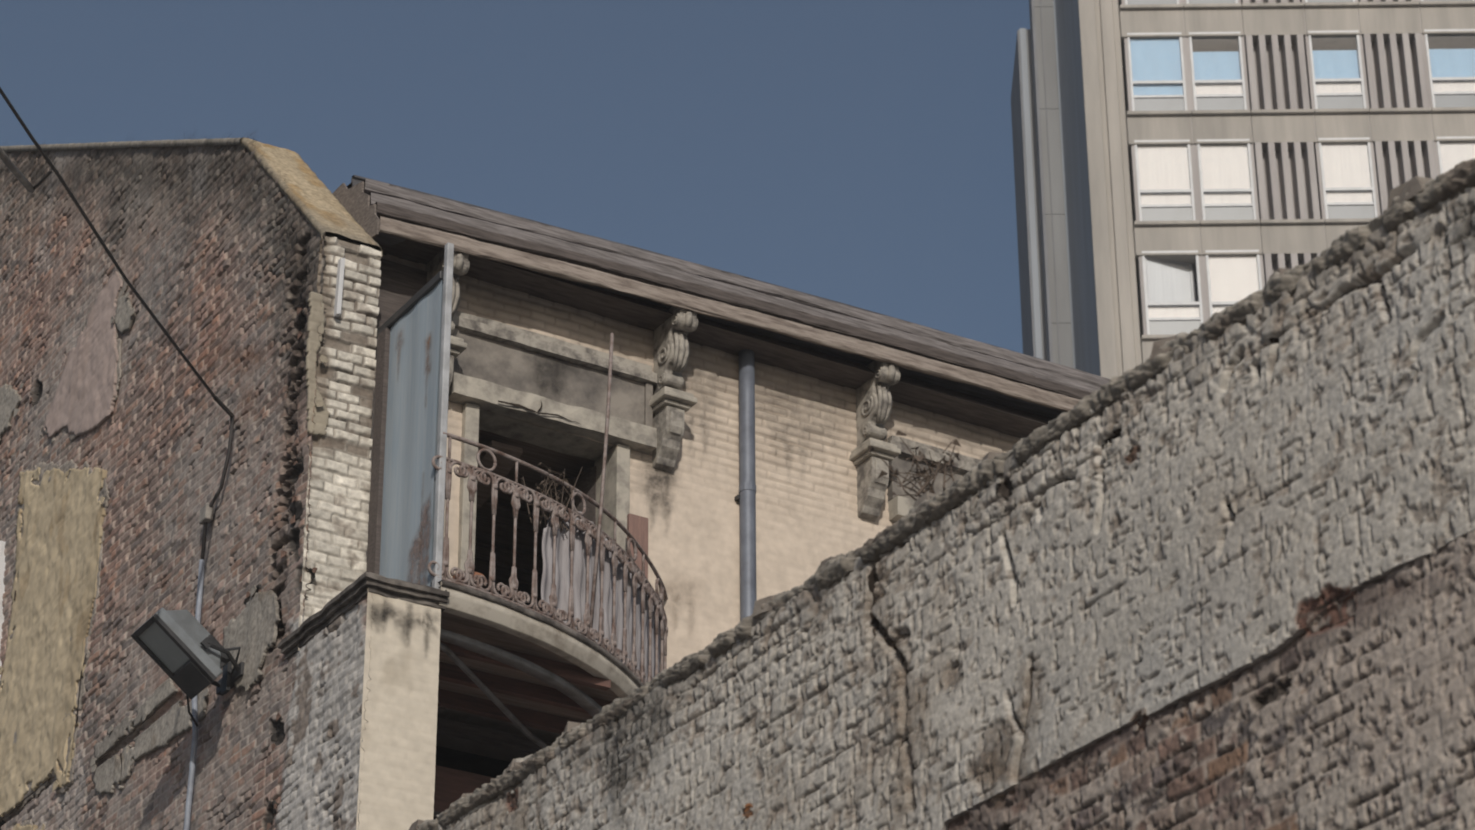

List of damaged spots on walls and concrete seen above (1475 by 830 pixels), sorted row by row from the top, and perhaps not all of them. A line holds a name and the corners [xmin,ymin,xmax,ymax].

spalling [1125,445,1141,463]
spalling [290,457,304,524]
spalling [996,476,1014,499]
peeling [0,271,135,830]
spalling [281,543,318,583]
spalling [244,583,261,605]
leakage [373,608,420,628]
crack [867,567,916,808]
flaking render [947,516,1475,830]
spalling [271,712,285,751]
spalling [267,800,279,830]